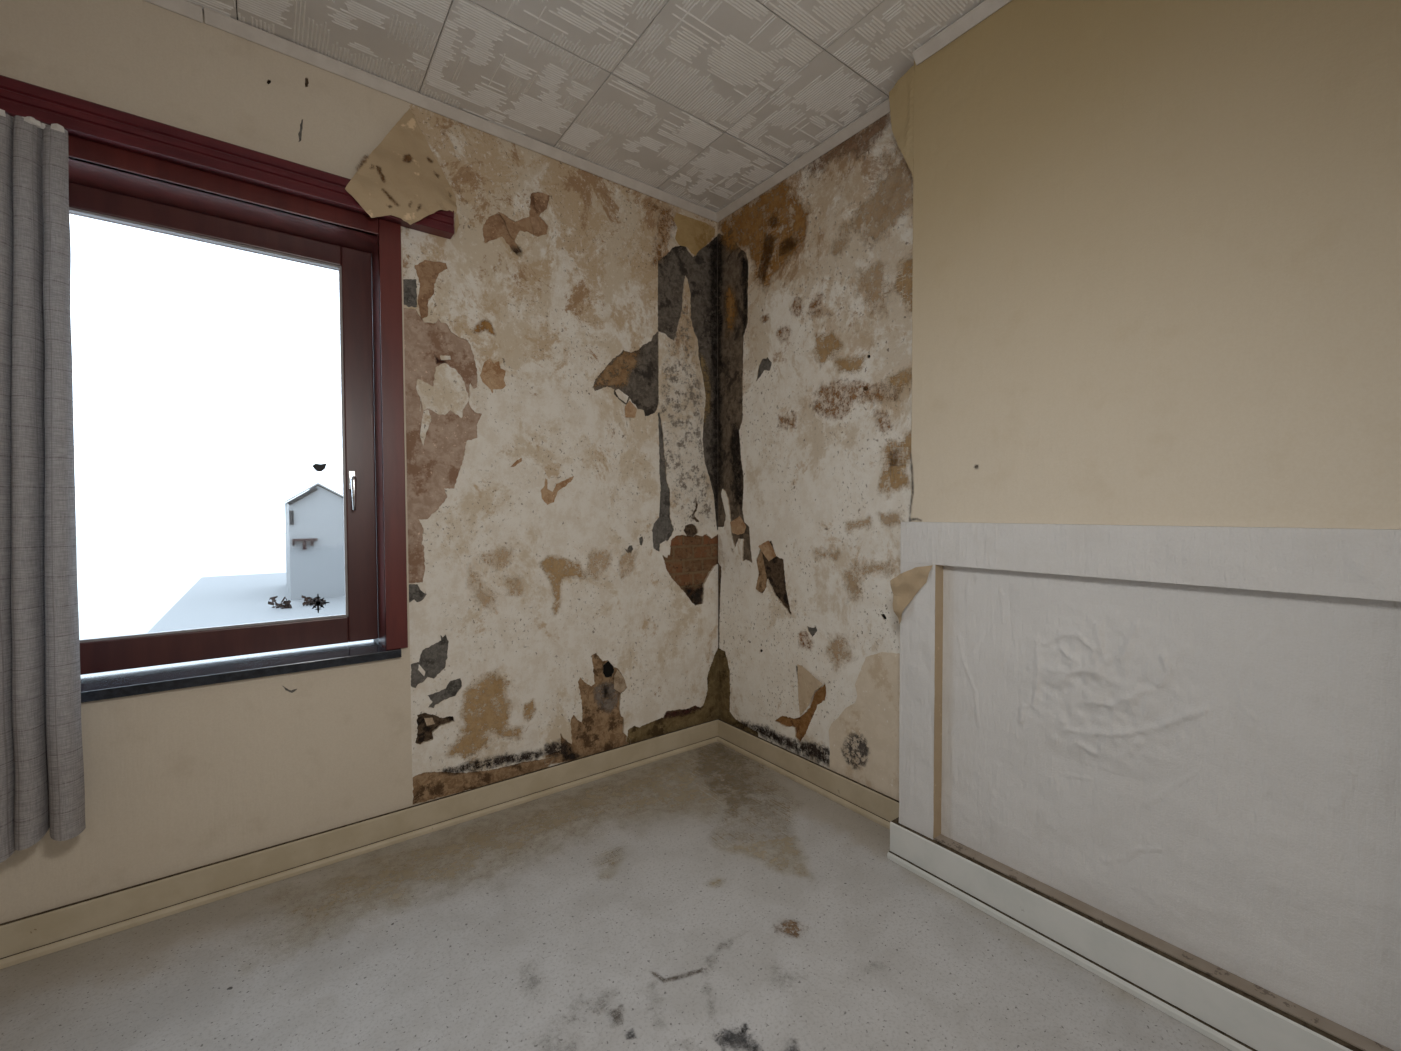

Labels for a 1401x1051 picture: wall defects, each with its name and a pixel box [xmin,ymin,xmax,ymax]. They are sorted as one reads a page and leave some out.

peeling [345,108,459,233]
peeling [420,410,431,445]
spalling [593,331,659,418]
damp [657,230,752,563]
spalling [756,357,772,381]
spalling [541,476,574,505]
flaking render [660,524,718,606]
peeling [756,541,776,593]
damp [443,674,567,774]
spalling [413,648,758,805]
damp [741,722,869,769]
peeling [797,664,822,716]